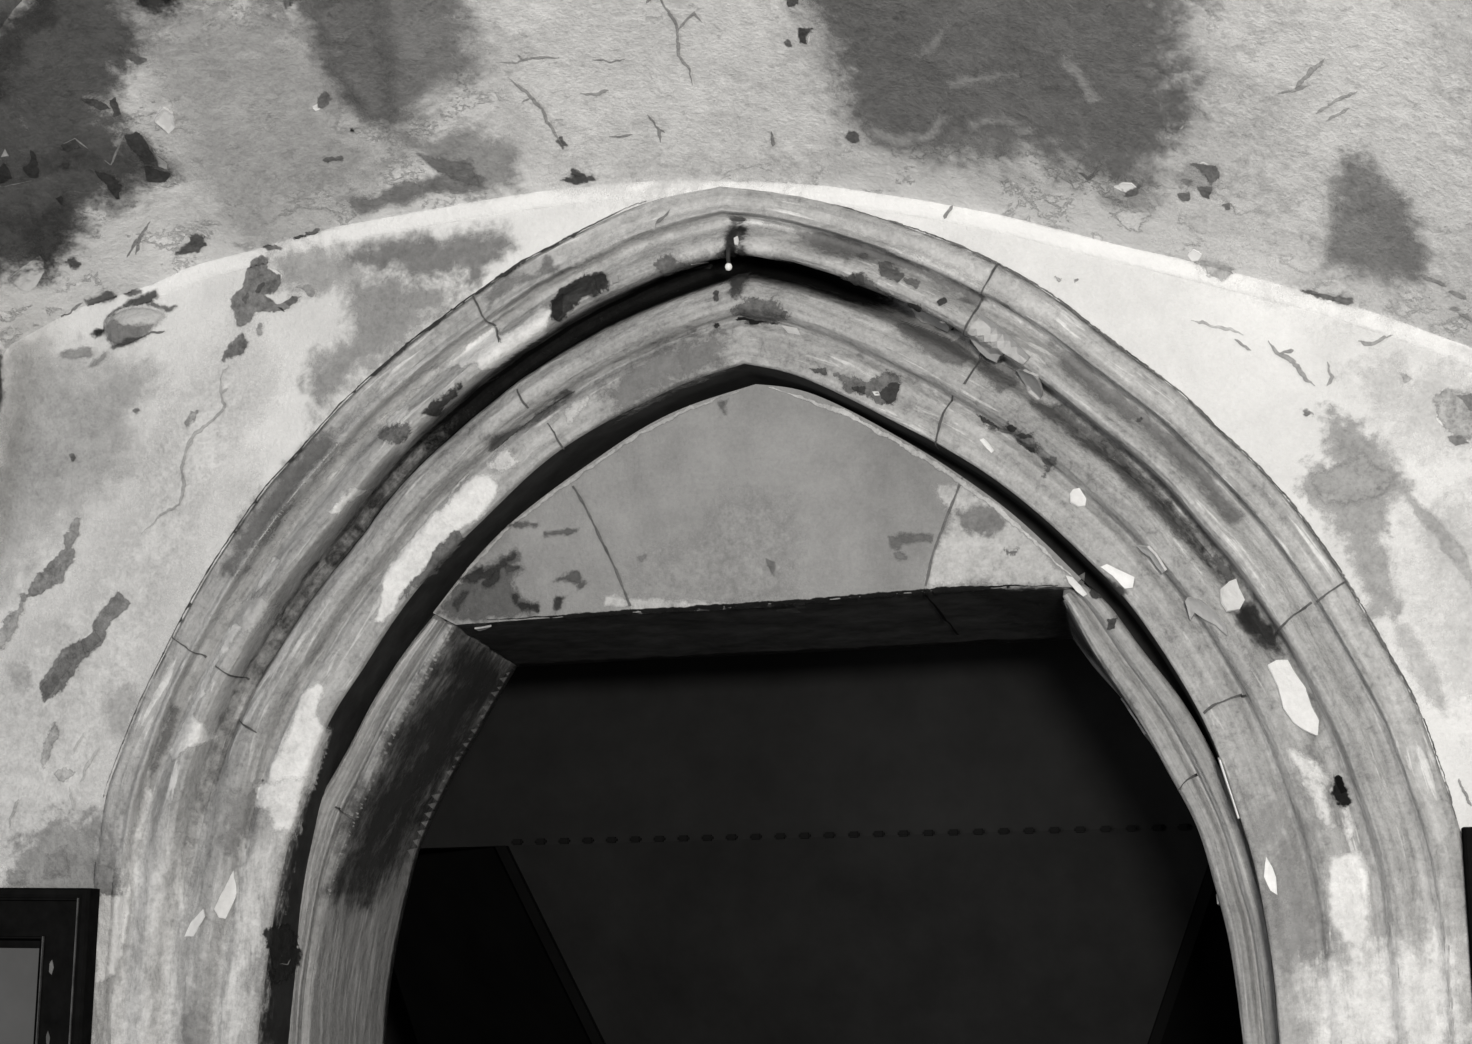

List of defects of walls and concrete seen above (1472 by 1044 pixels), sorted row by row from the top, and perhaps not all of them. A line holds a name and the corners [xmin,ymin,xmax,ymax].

damp [268,0,516,214]
crack [646,0,702,86]
damp [800,0,1206,191]
damp [0,191,68,279]
peeling [222,228,320,362]
peeling [550,271,619,322]
damp [1328,157,1426,281]
peeling [0,517,80,651]
peeling [39,590,131,705]
crack [69,201,670,810]
peeling [1267,660,1319,736]
damp [1304,406,1472,710]